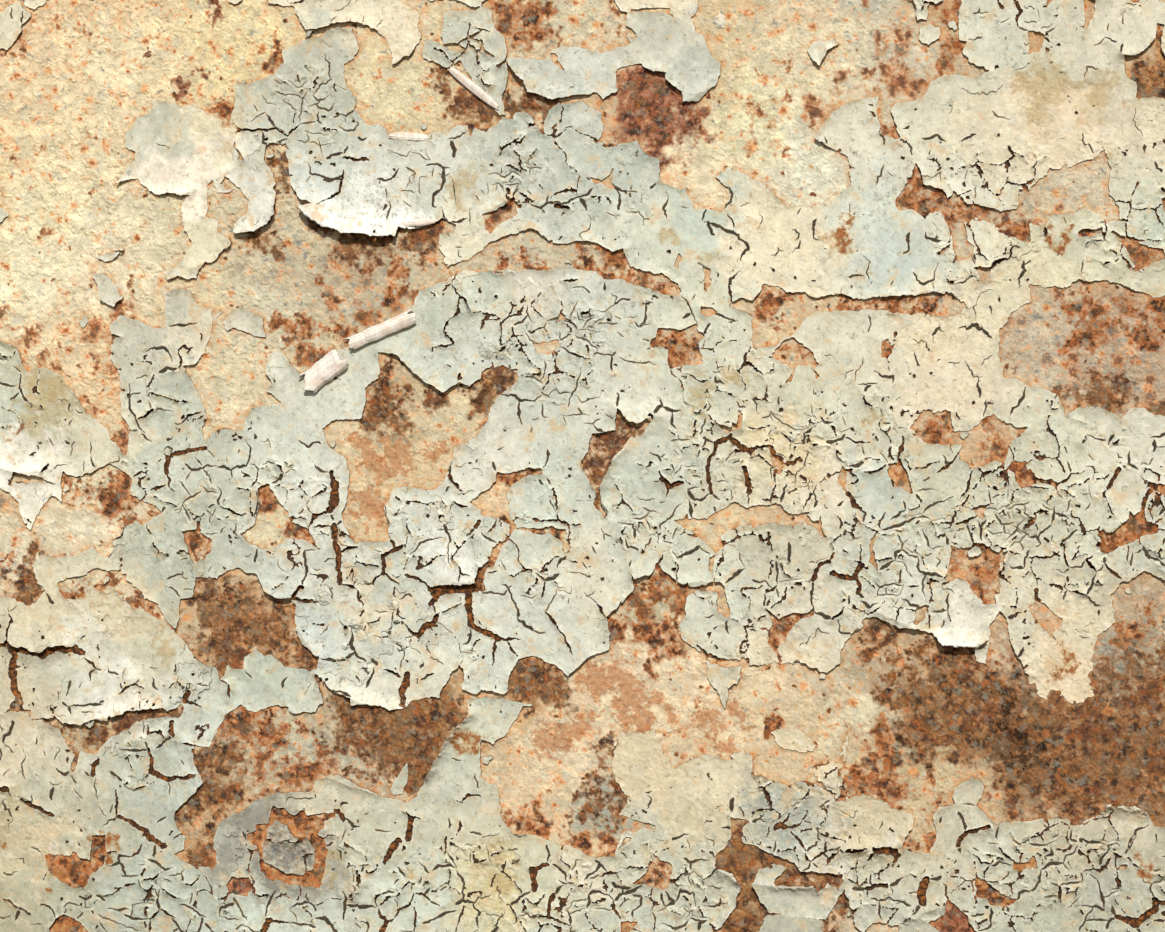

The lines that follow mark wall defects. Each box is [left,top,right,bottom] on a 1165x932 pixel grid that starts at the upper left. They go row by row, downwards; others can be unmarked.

corrosion [606,63,714,167]
corrosion [348,356,449,538]
corrosion [459,356,516,426]
crack [0,0,1165,705]
corrosion [1050,284,1165,416]
peeling [0,646,96,932]
corrosion [180,575,318,676]
corrosion [175,693,481,895]
crack [0,605,1165,932]
peeling [66,679,1165,932]
corrosion [713,810,862,932]
corrosion [830,599,1165,853]